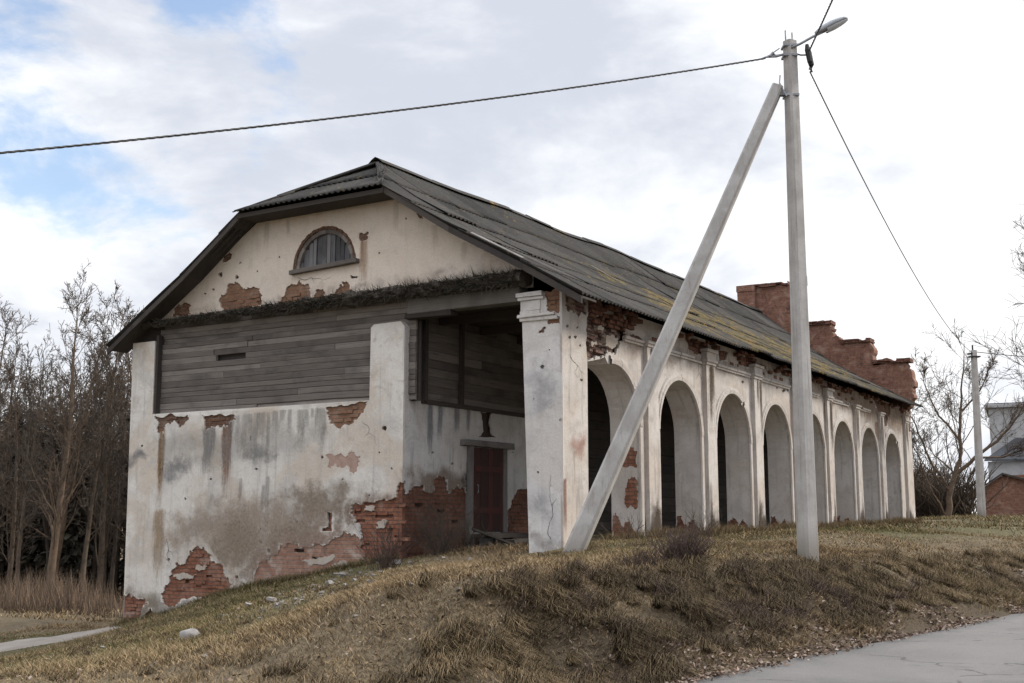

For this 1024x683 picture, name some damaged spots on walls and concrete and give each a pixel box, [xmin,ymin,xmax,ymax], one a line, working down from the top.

flaking render [205,253,262,310]
flaking render [278,275,357,304]
flaking render [586,325,639,349]
flaking render [687,340,727,361]
flaking render [327,402,367,429]
damp [174,485,346,573]
flaking render [323,452,360,480]
flaking render [254,476,467,582]
flaking render [508,489,529,544]
flaking render [612,447,638,537]
flaking render [162,546,238,607]
flaking render [123,593,148,623]